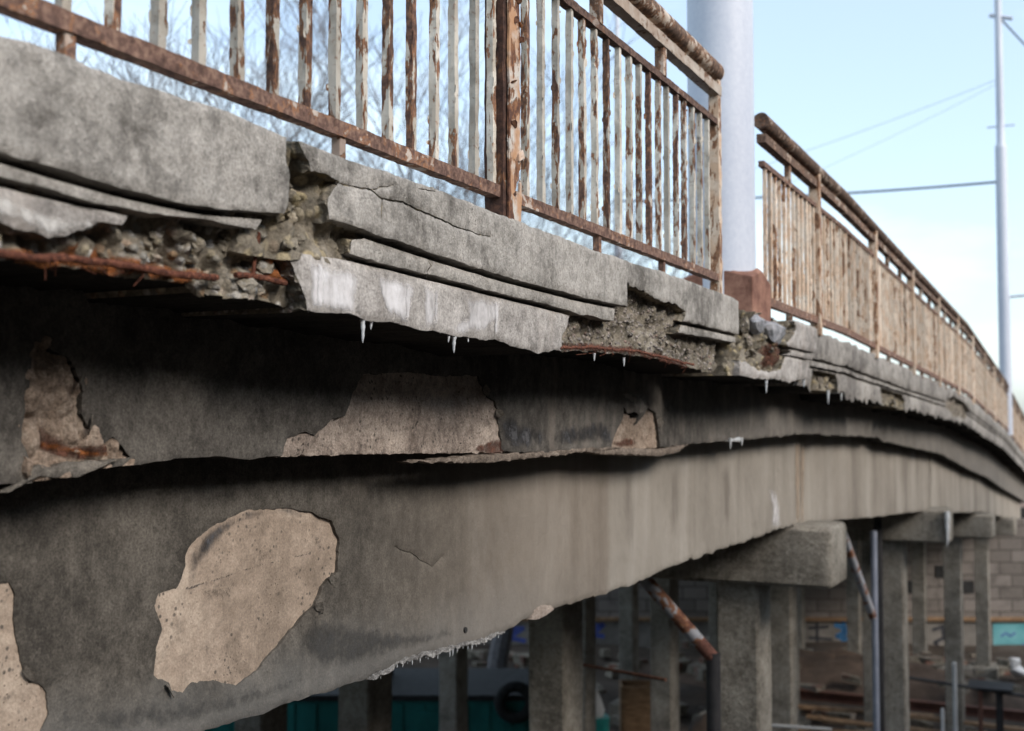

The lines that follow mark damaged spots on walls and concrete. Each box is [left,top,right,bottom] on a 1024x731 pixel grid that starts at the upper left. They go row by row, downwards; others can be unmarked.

rust [7,245,203,282]
spalling [0,149,377,313]
rust [250,259,290,284]
crack [335,182,488,237]
spalling [513,290,838,393]
peeling [0,336,135,493]
peeling [267,372,688,464]
peeling [154,508,337,698]
peeling [0,583,47,731]